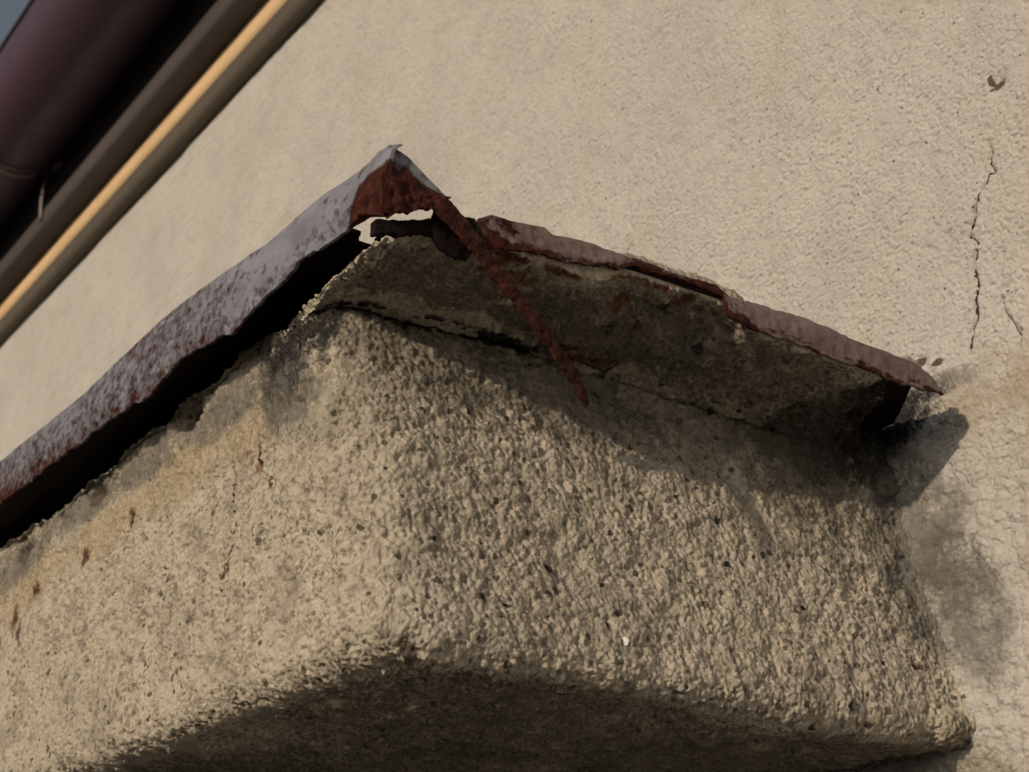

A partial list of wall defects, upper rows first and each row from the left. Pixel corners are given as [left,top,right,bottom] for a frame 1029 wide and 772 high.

crack [296,299,622,373]
rust [544,264,582,281]
crack [970,146,1023,352]
damp [347,316,1008,673]